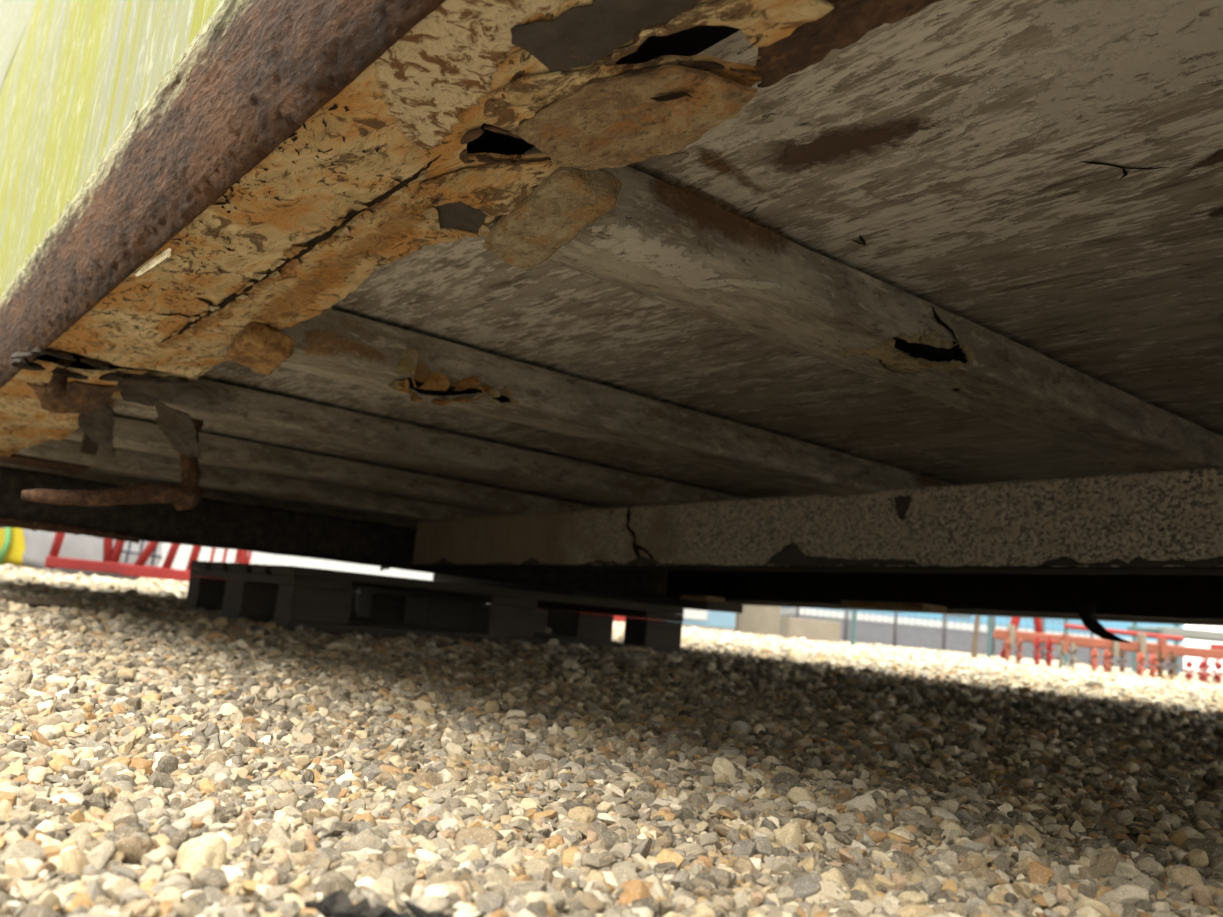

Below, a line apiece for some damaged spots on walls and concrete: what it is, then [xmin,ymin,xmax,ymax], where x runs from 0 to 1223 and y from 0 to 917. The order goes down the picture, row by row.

peeling [152,0,228,97]
peeling [483,0,834,132]
peeling [3,156,104,300]
peeling [135,248,171,277]
crack [113,104,441,343]
peeling [410,160,560,237]
peeling [862,334,975,369]
crack [626,506,654,566]